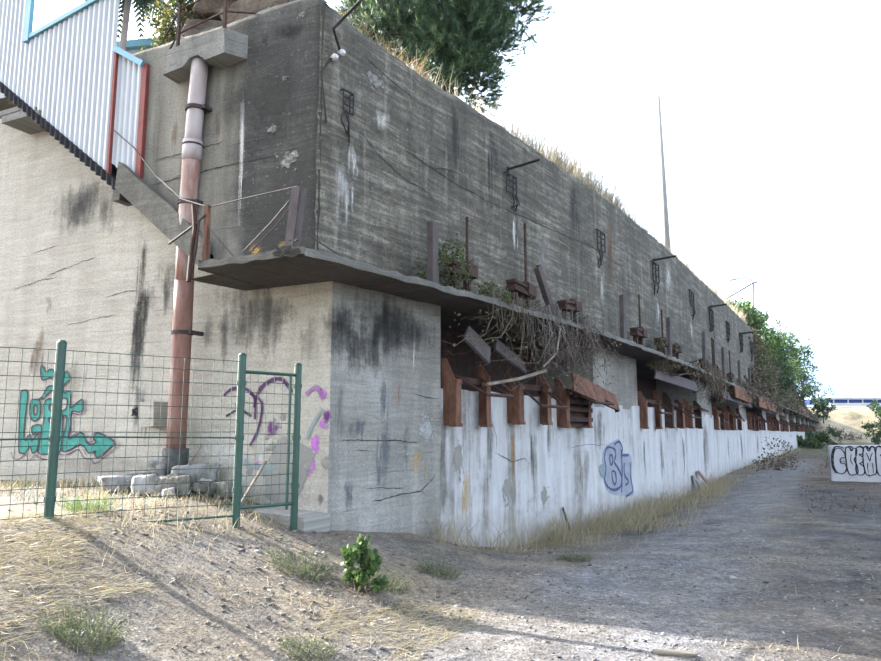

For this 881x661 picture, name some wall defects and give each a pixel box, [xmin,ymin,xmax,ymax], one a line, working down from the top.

spalling [275,150,301,172]
water stain [131,291,148,382]
water stain [328,311,393,359]
crack [342,439,436,501]